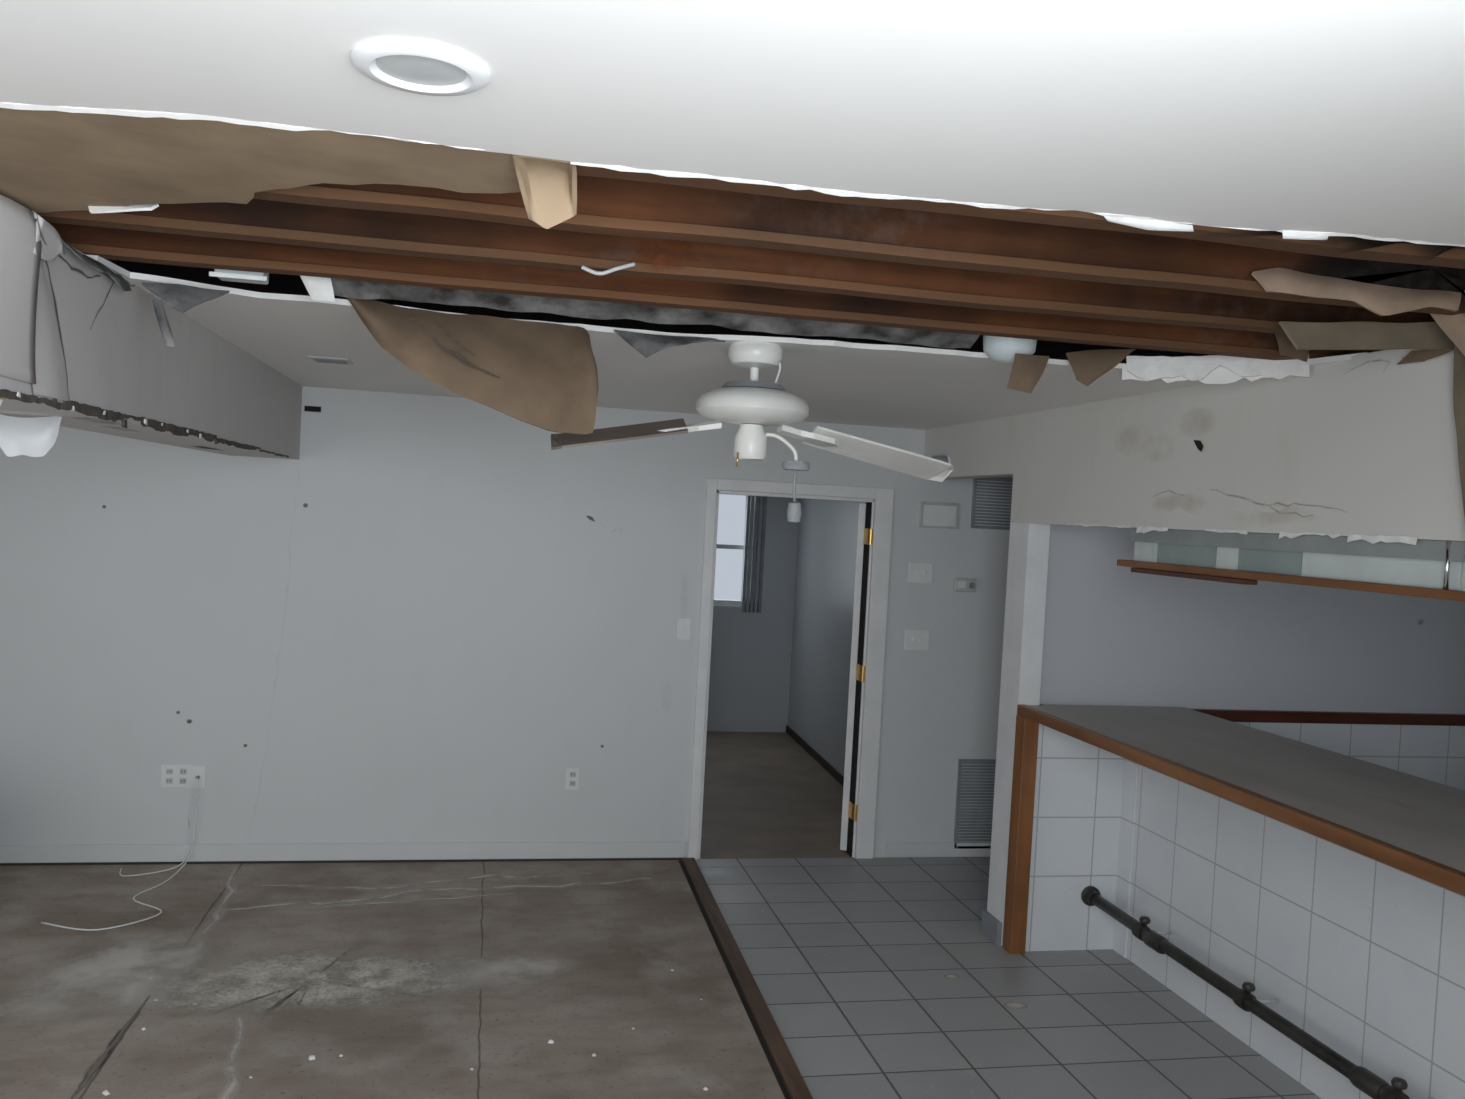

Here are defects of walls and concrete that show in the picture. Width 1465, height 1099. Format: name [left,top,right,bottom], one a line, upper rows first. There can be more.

peeling [0,102,1058,213]
peeling [1090,212,1194,232]
peeling [1212,226,1464,246]
peeling [1067,524,1168,533]
peeling [1279,532,1417,545]